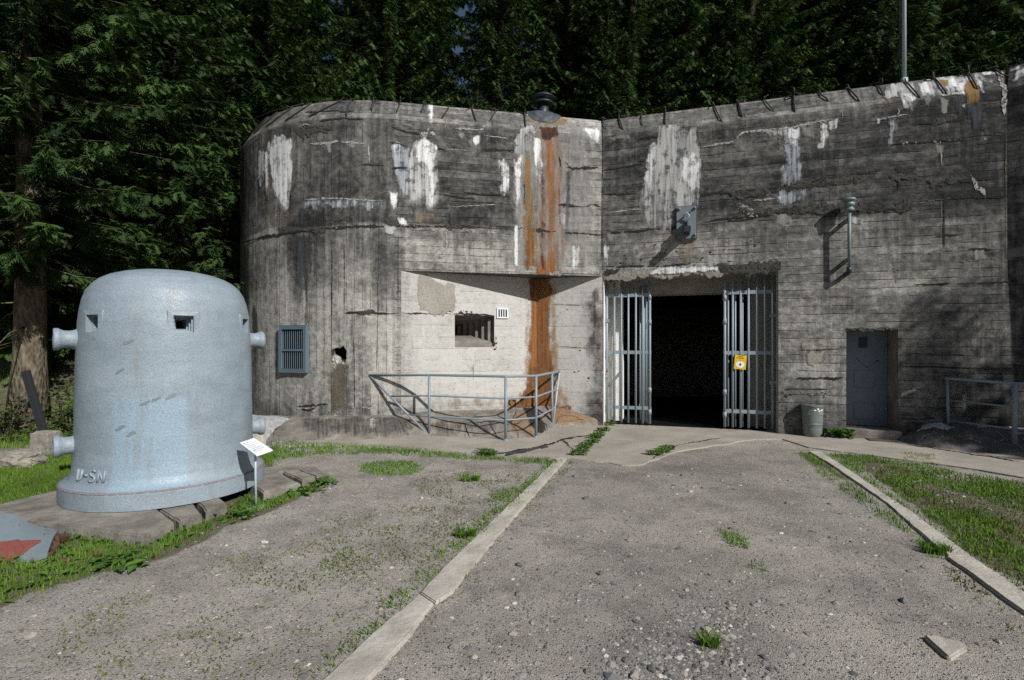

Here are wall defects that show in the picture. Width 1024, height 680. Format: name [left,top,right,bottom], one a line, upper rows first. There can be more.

corrosion [508,118,595,433]
spalling [603,260,781,281]
spalling [331,346,346,365]